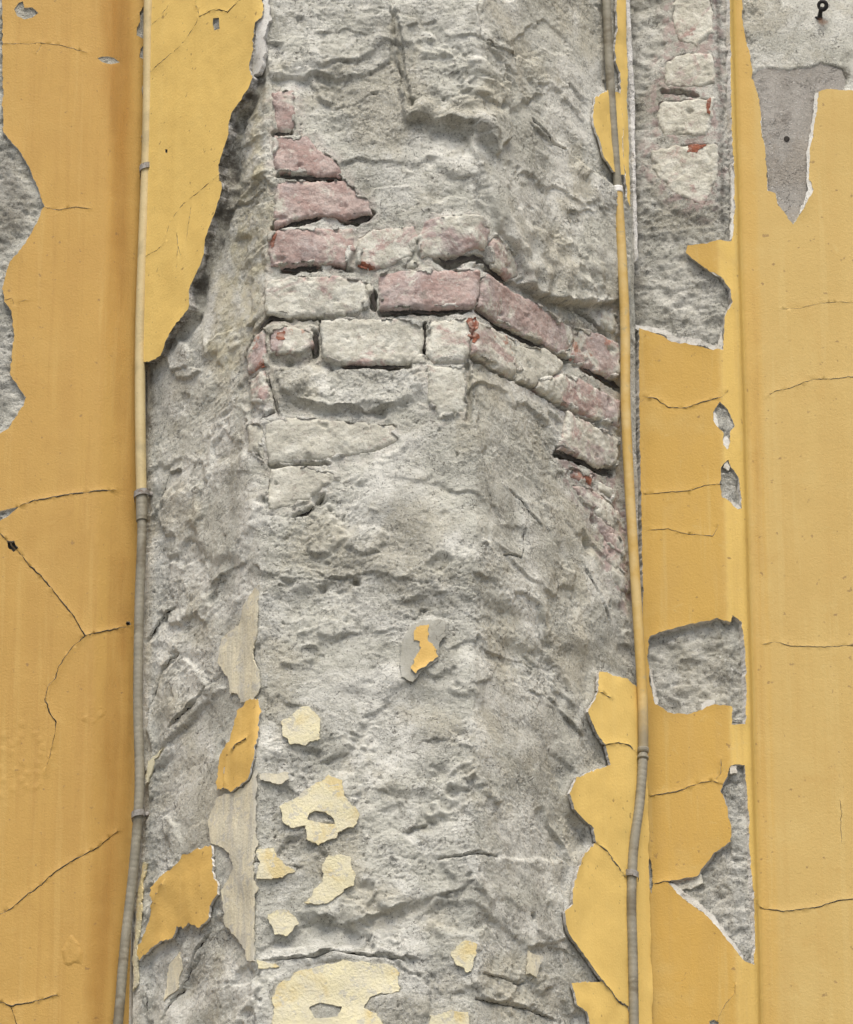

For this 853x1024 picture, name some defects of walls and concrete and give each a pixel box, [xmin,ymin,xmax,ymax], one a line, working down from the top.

spalling [0,0,44,433]
spalling [591,0,734,402]
spalling [742,0,853,224]
flaking render [246,90,627,591]
crack [0,534,116,755]
crack [9,833,115,910]
peeling [132,845,220,991]
peeling [216,699,289,792]
peeling [279,775,360,846]
peeling [271,960,400,1024]
spalling [647,619,743,725]
spalling [669,765,753,963]